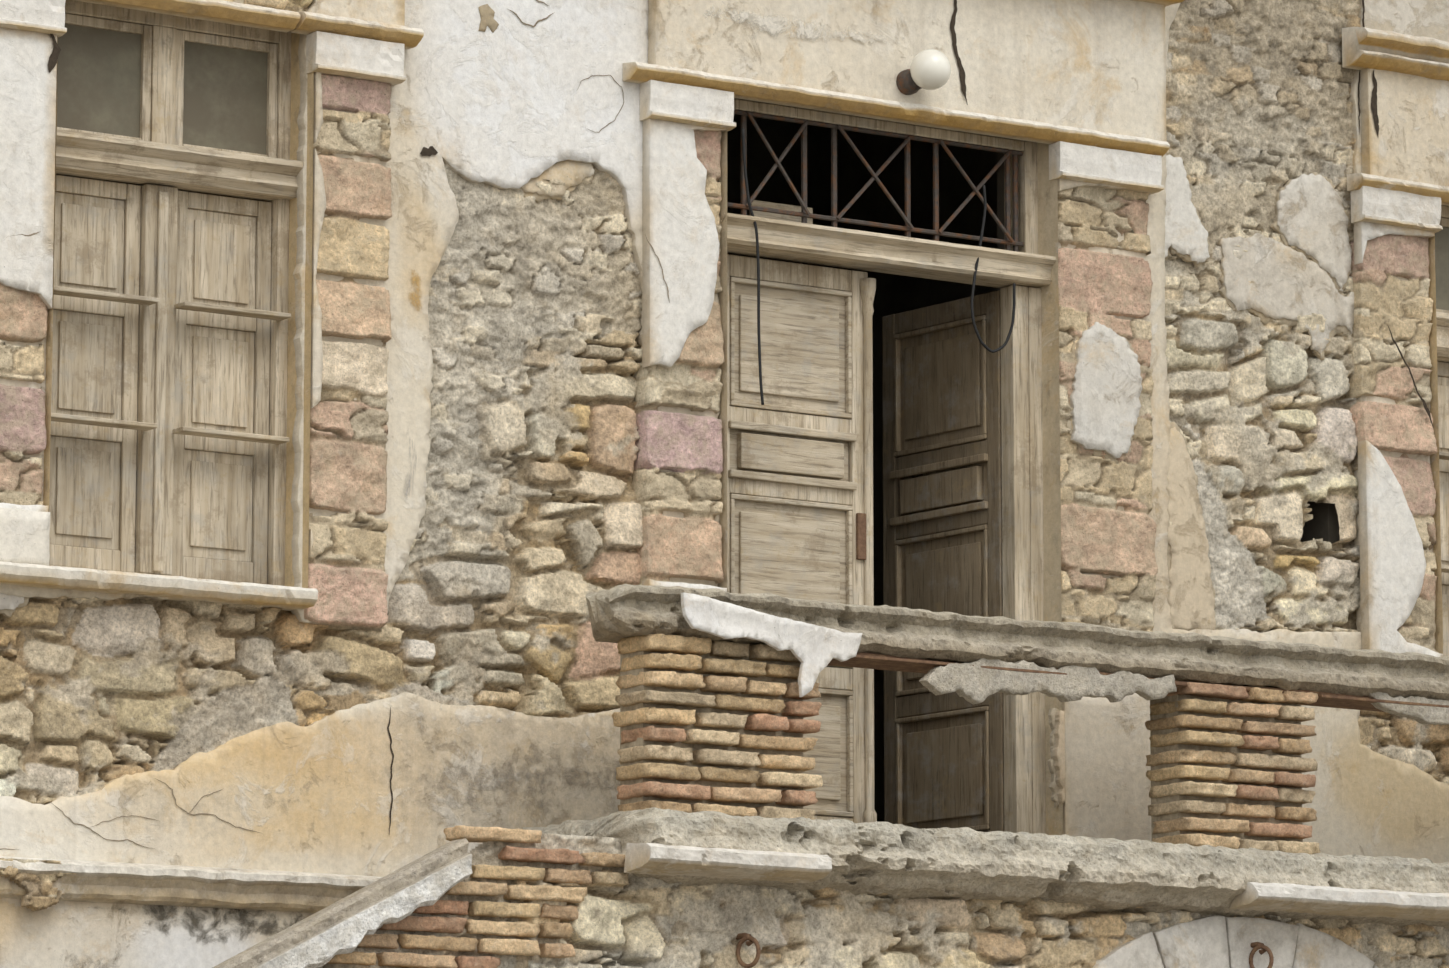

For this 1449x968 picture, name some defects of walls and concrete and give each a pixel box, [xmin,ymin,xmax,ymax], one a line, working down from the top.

flaking render [225,0,312,12]
crack [950,0,967,102]
flaking render [1058,0,1439,653]
flaking render [0,74,862,805]
crack [50,778,260,849]
crack [386,707,394,833]
flaking render [1047,708,1065,808]
flaking render [1358,710,1449,784]